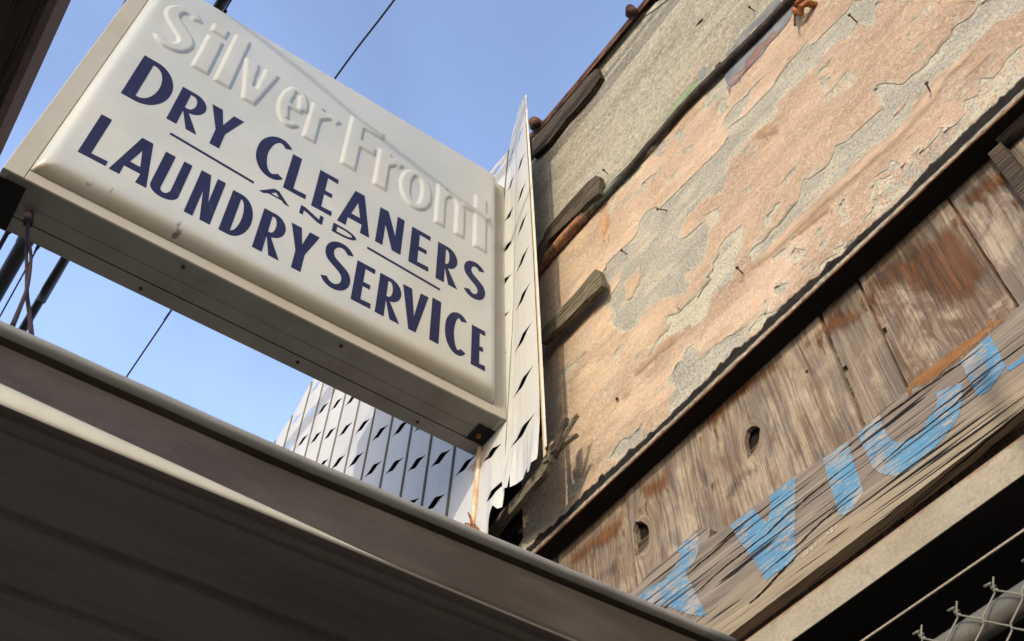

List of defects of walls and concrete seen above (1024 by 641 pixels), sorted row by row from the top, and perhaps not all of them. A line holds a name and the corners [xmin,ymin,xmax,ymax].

peeling [603,0,1024,363]
peeling [668,280,787,413]
rust [906,318,1003,397]
peeling [610,425,647,459]
crack [682,346,990,605]